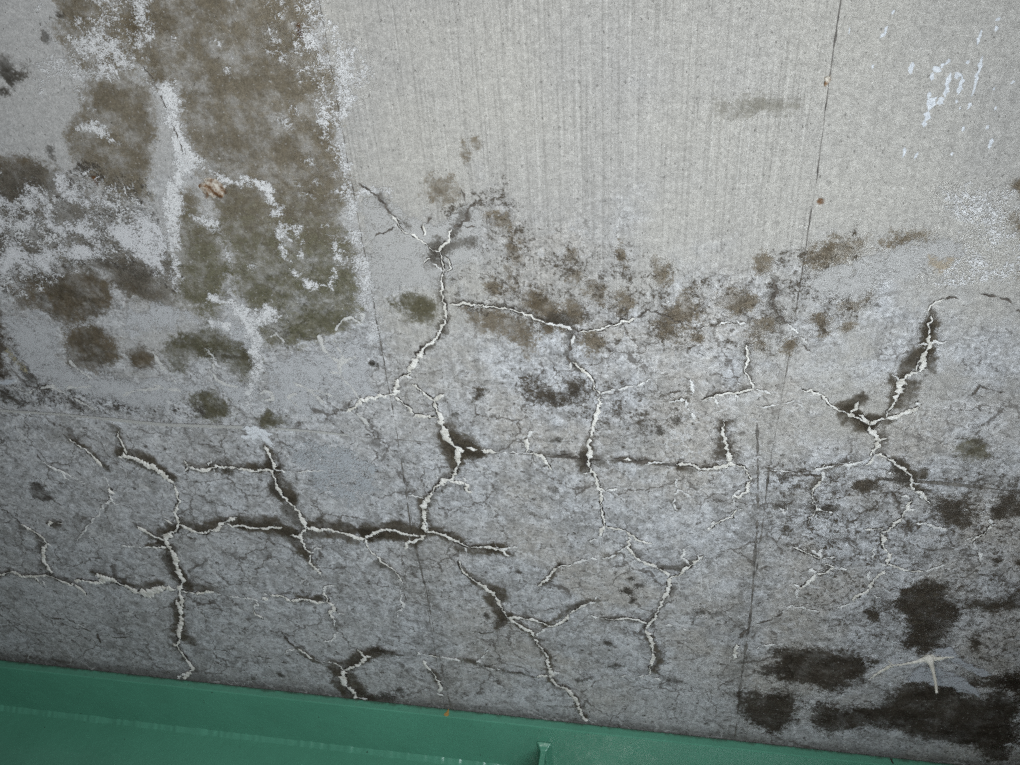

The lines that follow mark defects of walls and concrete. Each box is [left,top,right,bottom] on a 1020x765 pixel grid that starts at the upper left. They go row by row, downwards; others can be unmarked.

damp [0,0,1020,510]
crack [0,183,1020,722]
damp [621,577,643,604]
damp [734,439,1020,763]